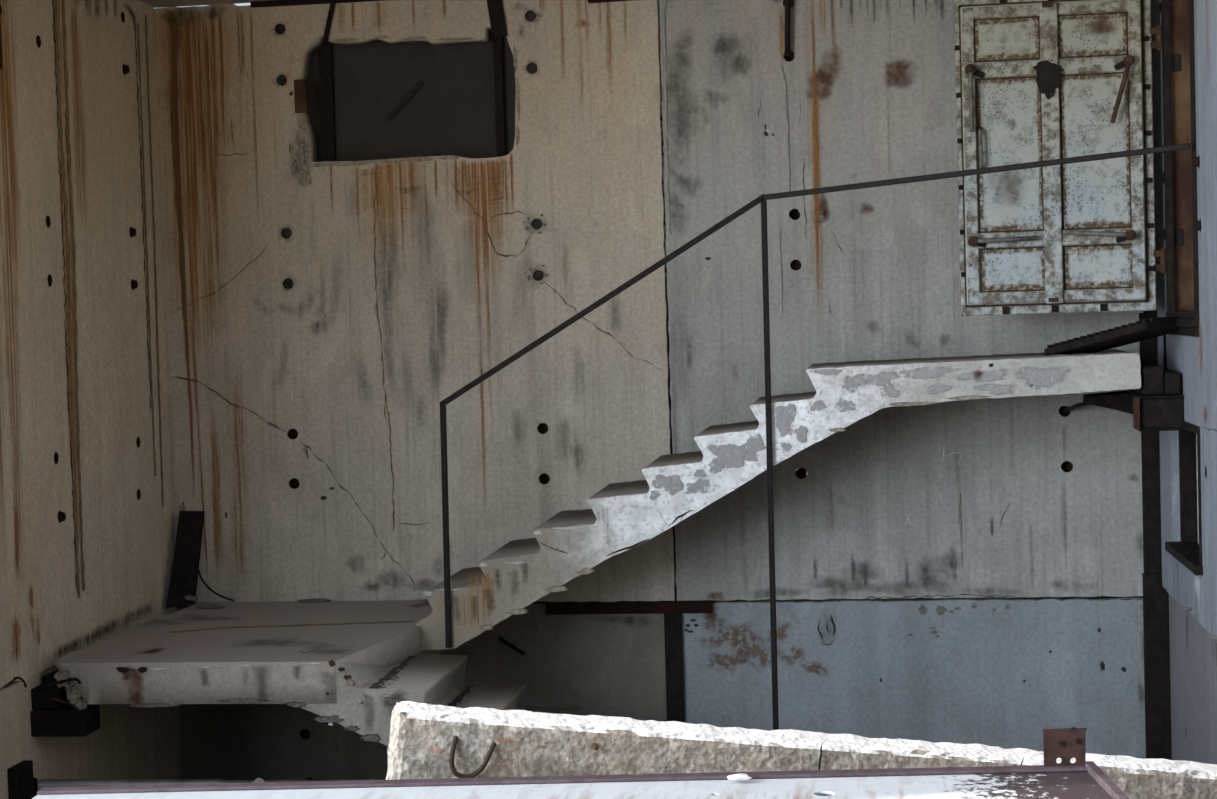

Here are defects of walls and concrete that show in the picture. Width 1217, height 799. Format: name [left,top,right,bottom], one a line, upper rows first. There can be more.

spalling [289,113,460,187]
rust [811,11,837,267]
rust [0,0,18,488]
rust [168,8,224,560]
crack [127,15,428,592]
rust [356,162,413,238]
rust [454,155,513,289]
crack [544,281,662,371]
peeling [650,434,765,500]
peeling [775,404,808,450]
peeling [810,363,1070,412]
spalling [546,585,568,593]